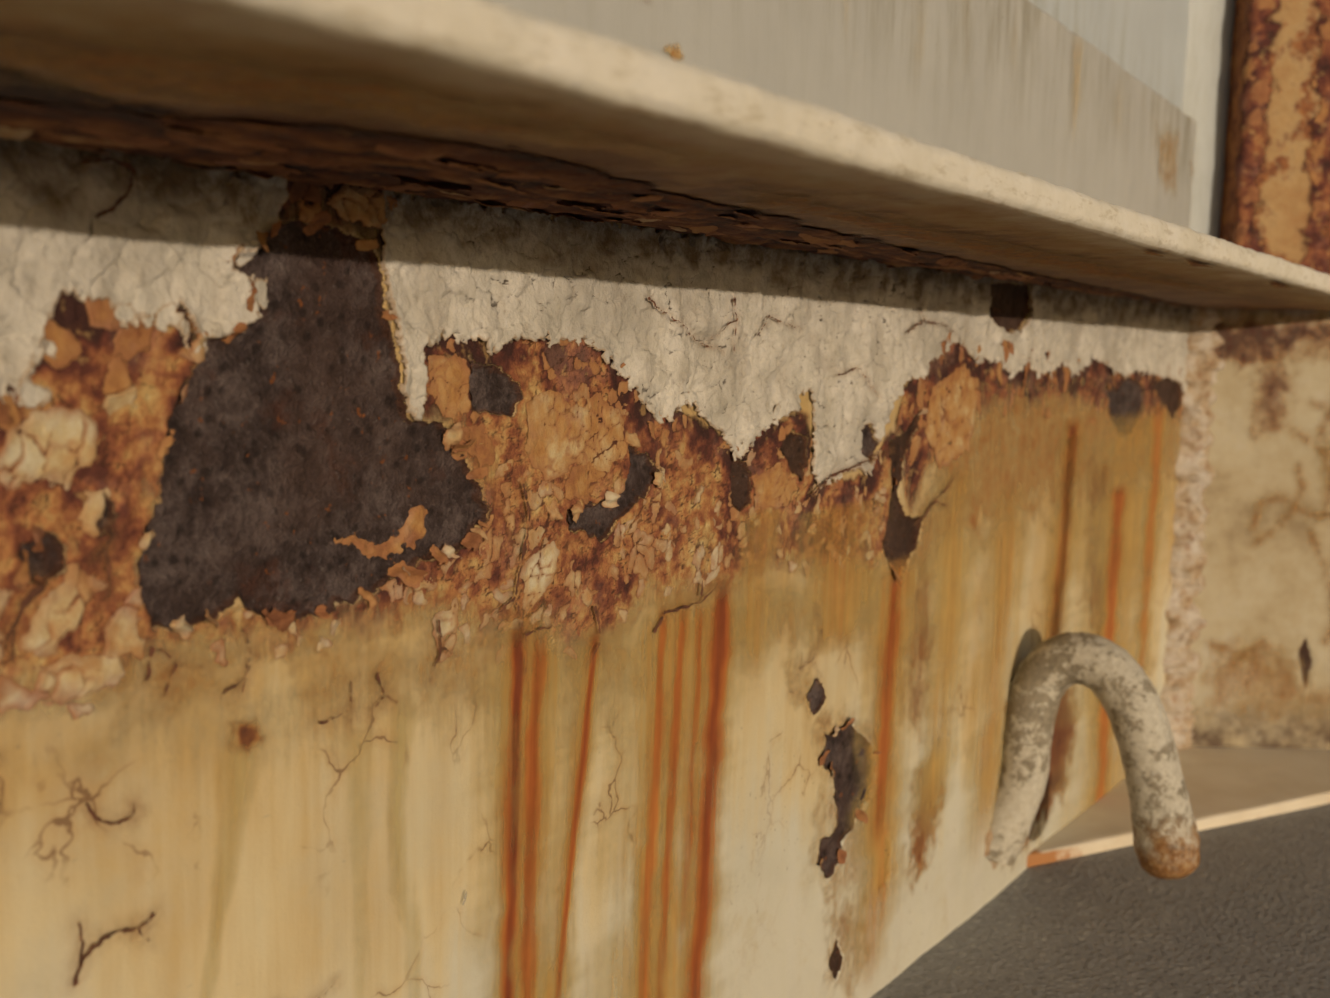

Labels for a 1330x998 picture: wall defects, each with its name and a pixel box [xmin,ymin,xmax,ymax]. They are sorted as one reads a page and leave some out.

rust [1230,0,1282,252]
rust [1299,0,1330,275]
peeling [0,125,355,408]
peeling [374,144,1192,489]
crack [86,802,135,825]
crack [319,672,401,725]
crack [430,620,459,683]
rust [0,181,1185,998]
crack [73,913,156,987]